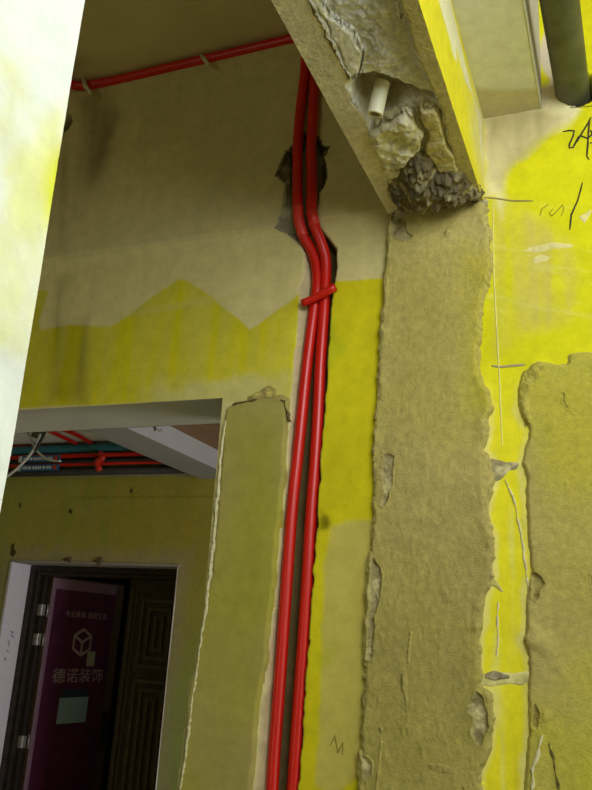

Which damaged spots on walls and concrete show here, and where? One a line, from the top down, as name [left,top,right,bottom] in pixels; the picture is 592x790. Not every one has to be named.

spalling [309,0,488,242]
spalling [275,150,292,185]
spalling [379,452,396,509]
peeling [491,459,519,481]
spalling [363,551,385,663]
spalling [529,571,547,603]